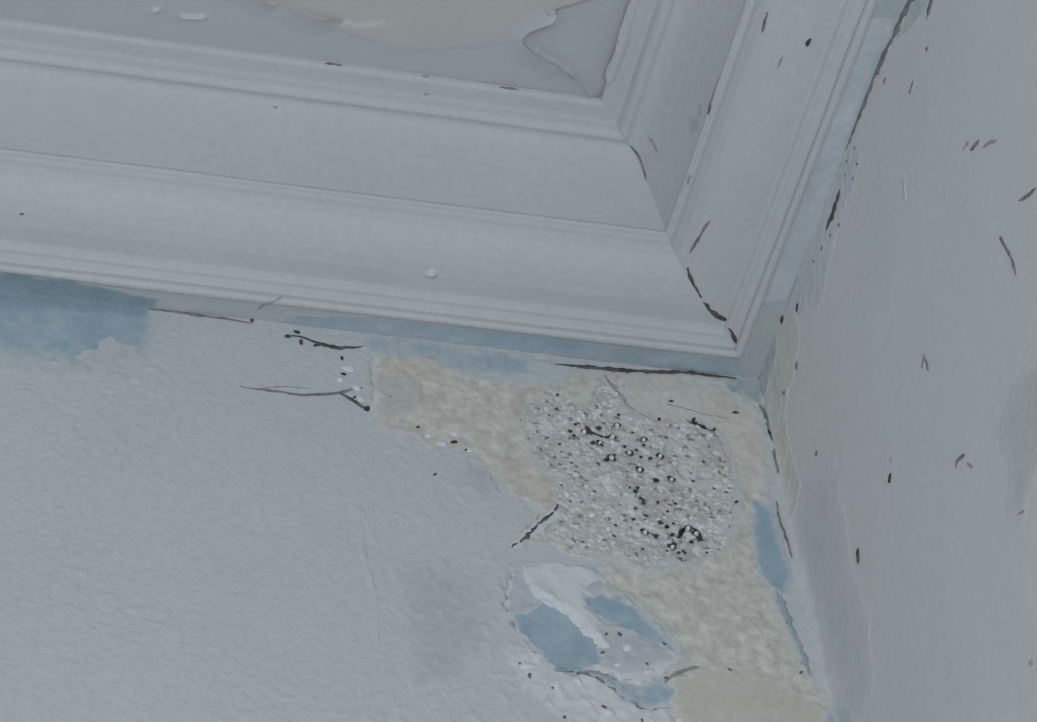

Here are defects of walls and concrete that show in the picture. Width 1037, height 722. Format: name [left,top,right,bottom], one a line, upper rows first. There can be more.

peeling [504,0,631,99]
crack [630,145,646,180]
peeling [759,0,933,317]
peeling [0,272,161,389]
crack [285,330,362,350]
crack [687,221,737,343]
crack [240,386,364,408]
crack [555,364,737,422]
flaking render [279,312,831,722]